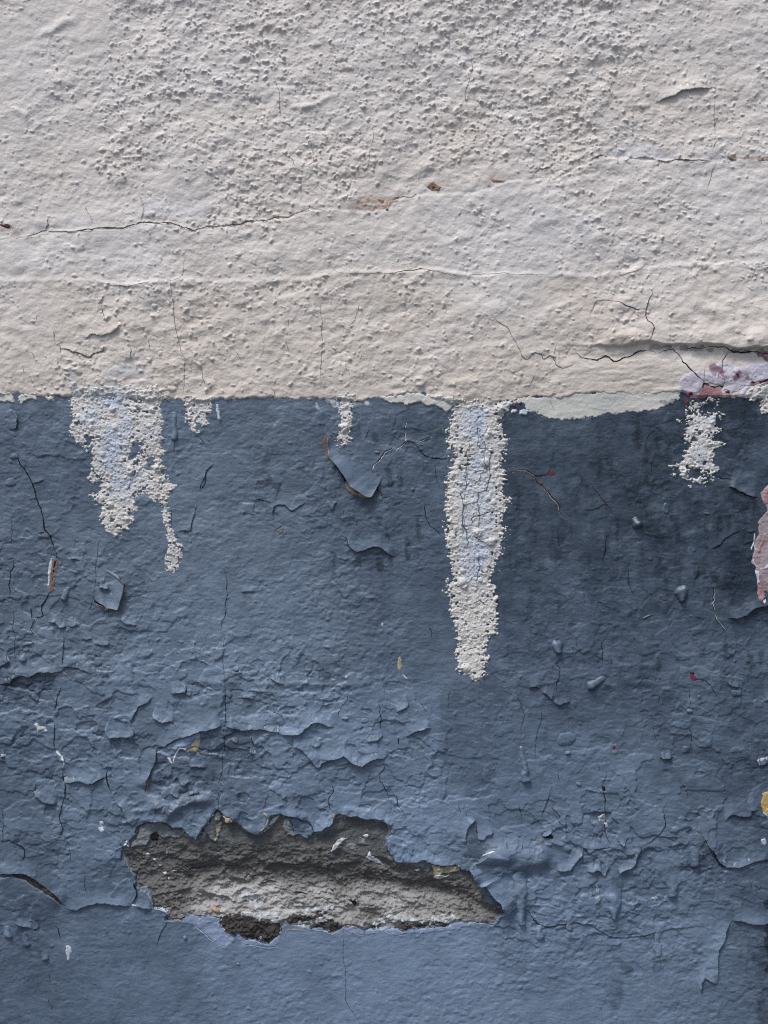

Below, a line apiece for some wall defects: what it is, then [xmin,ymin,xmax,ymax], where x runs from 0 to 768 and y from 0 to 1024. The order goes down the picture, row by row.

crack [11,195,332,238]
crack [491,292,768,386]
peeling [679,361,768,397]
peeling [322,432,394,501]
water stain [442,394,514,682]
peeling [727,472,768,620]
spalling [0,657,532,949]
peeling [556,836,642,904]